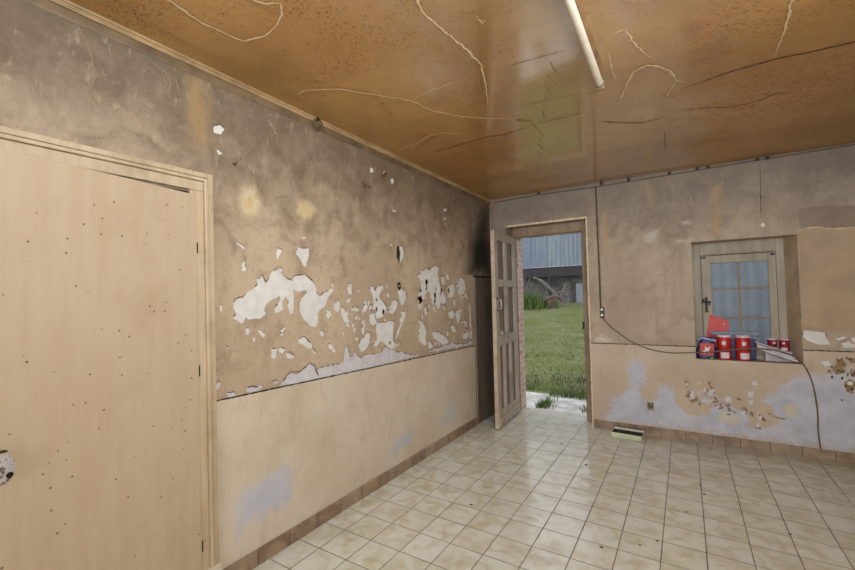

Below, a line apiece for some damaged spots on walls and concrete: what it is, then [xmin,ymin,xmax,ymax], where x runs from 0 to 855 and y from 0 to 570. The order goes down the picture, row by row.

crack [167,0,283,42]
crack [297,0,578,154]
peeling [233,237,473,386]
flaking render [675,378,786,430]